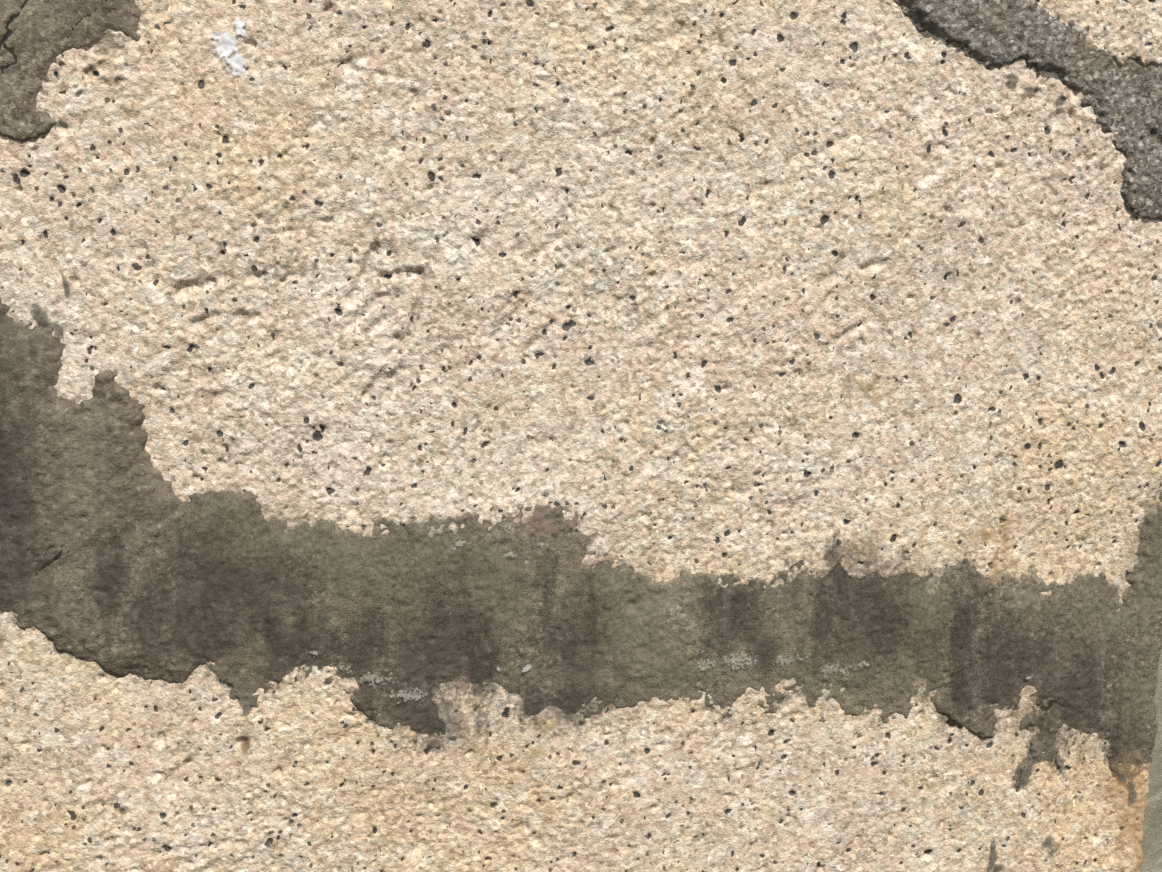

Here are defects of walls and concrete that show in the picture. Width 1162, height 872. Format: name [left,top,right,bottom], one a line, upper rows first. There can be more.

crack [0,0,28,73]
leakage [334,602,500,734]
leakage [694,549,929,679]